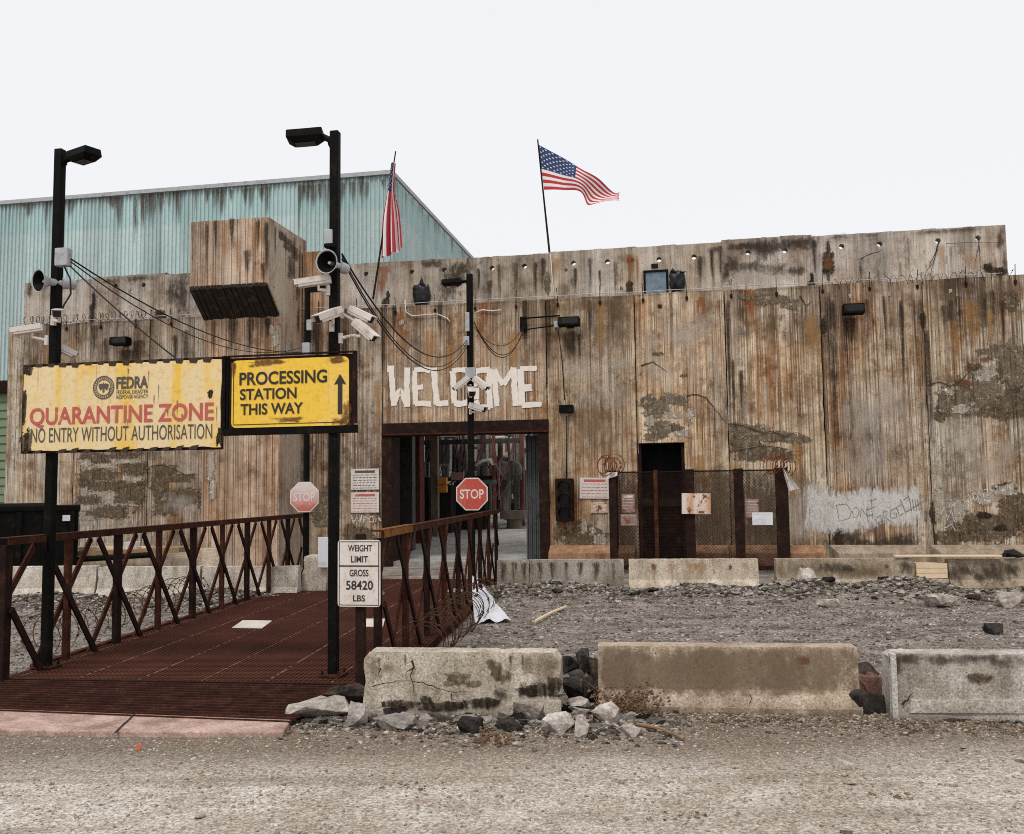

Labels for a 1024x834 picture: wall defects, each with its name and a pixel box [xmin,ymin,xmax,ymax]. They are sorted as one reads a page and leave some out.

damp [697,236,816,281]
spalling [933,336,1024,424]
spalling [635,392,695,441]
spalling [729,422,813,465]
spalling [73,450,217,521]
peeling [794,482,1024,545]
crack [372,660,465,701]